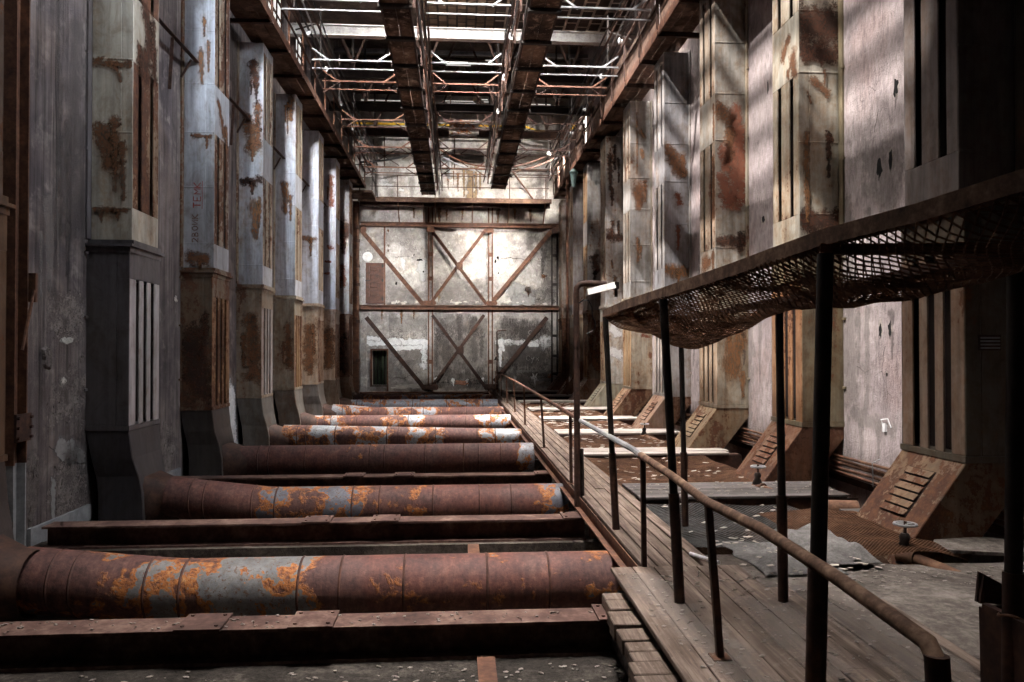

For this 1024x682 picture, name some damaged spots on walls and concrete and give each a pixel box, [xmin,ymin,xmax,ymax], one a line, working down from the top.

corrosion [93,2,158,86]
corrosion [780,0,838,104]
corrosion [92,115,131,223]
corrosion [190,99,228,149]
corrosion [239,175,263,240]
corrosion [242,58,263,162]
corrosion [280,181,293,221]
corrosion [606,112,647,210]
corrosion [665,143,688,179]
corrosion [711,100,745,220]
corrosion [182,310,212,405]